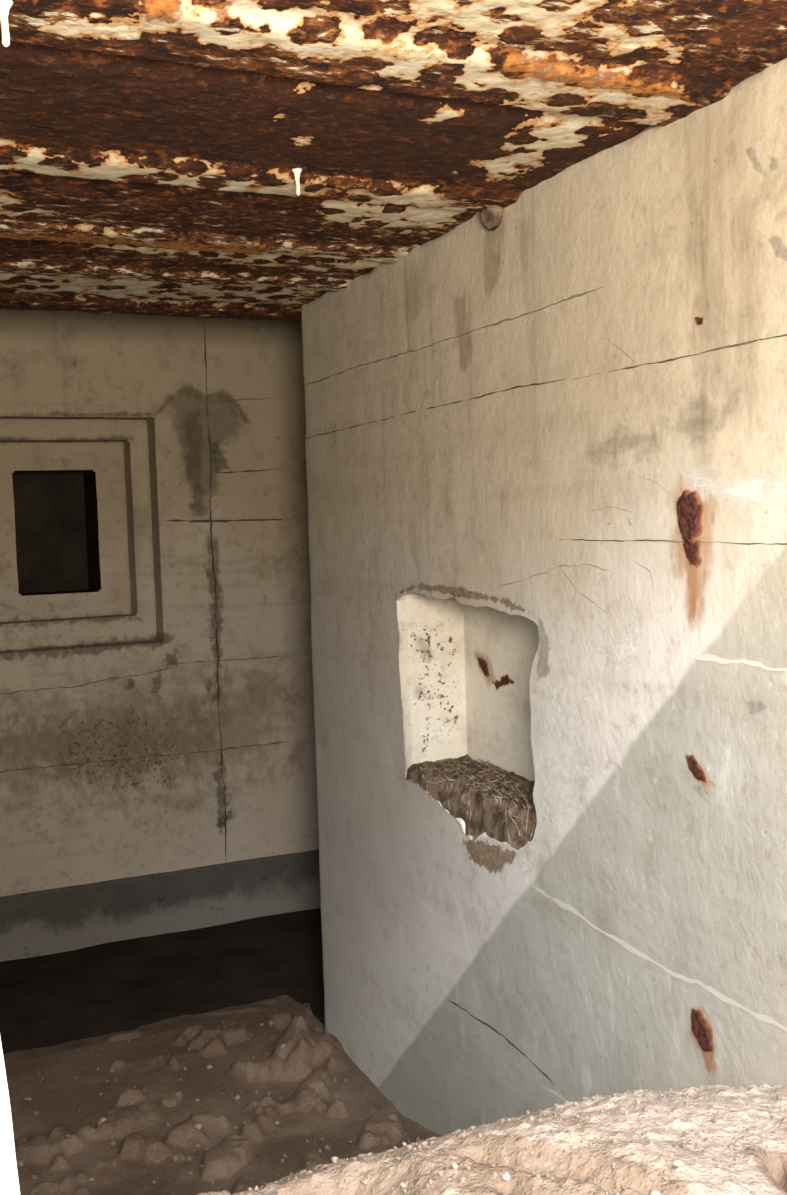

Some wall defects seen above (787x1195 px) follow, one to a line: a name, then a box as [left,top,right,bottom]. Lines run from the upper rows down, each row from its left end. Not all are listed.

rust [500,49,691,102]
crack [306,286,605,385]
crack [305,334,787,439]
crack [0,324,284,858]
spalling [400,583,524,612]
crack [502,507,787,611]
rust [677,490,704,567]
rust [478,657,514,689]
leakage [52,711,188,806]
rust [686,755,706,782]
spalling [463,840,532,873]
rust [691,1009,714,1052]